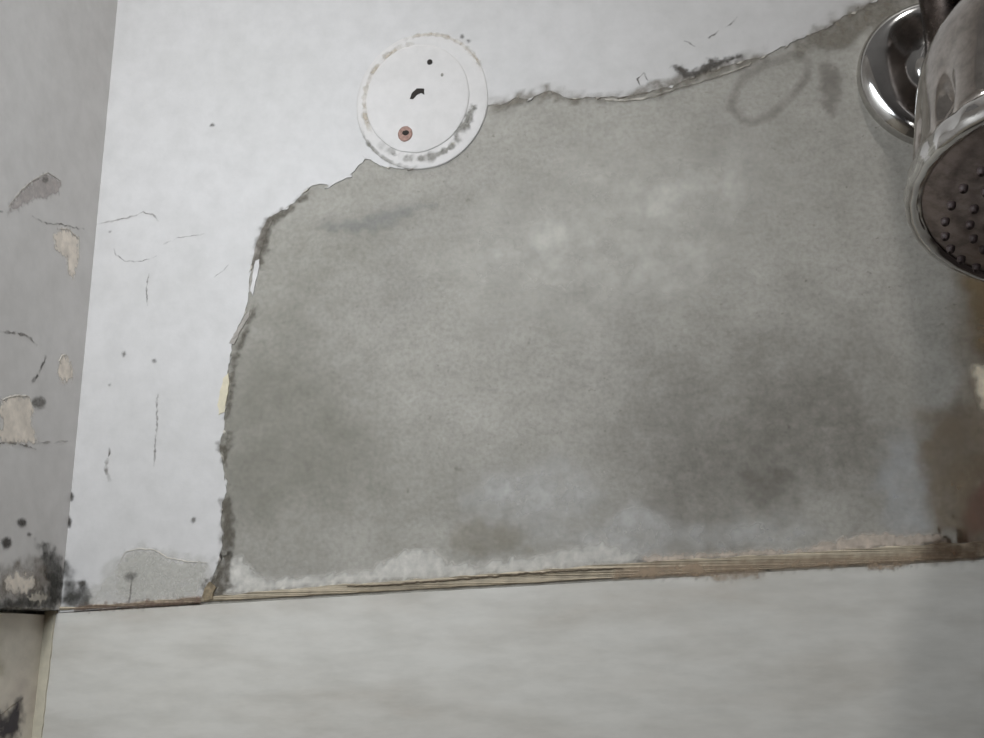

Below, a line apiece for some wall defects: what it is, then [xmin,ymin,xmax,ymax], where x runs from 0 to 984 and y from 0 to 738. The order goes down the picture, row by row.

flaking render [9,172,61,210]
peeling [54,223,80,277]
peeling [200,0,984,605]
peeling [0,395,50,448]
mould [0,543,88,610]
damp [0,699,22,738]